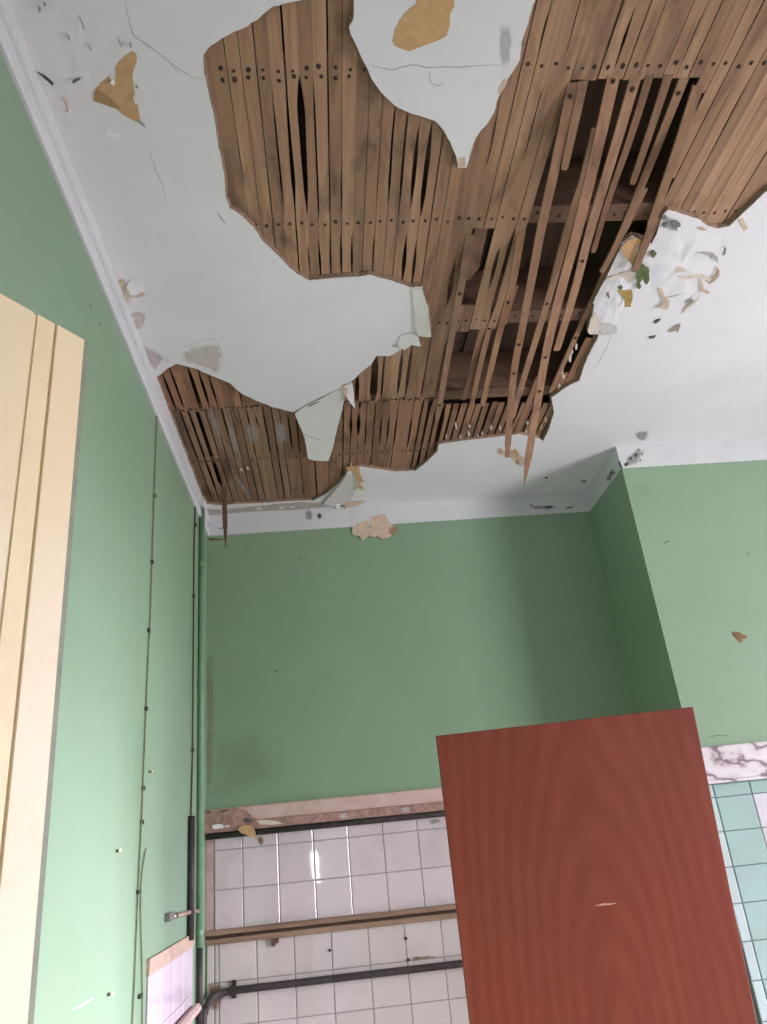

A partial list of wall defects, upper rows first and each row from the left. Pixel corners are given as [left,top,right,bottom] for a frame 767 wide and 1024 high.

crack [124,0,204,80]
peeling [392,0,455,51]
peeling [94,51,146,127]
flaking render [587,237,657,335]
flaking render [392,333,421,350]
flaking render [343,382,355,408]
peeling [497,447,525,466]
flaking render [207,466,365,515]
flaking render [352,514,398,540]
flaking render [205,807,283,841]